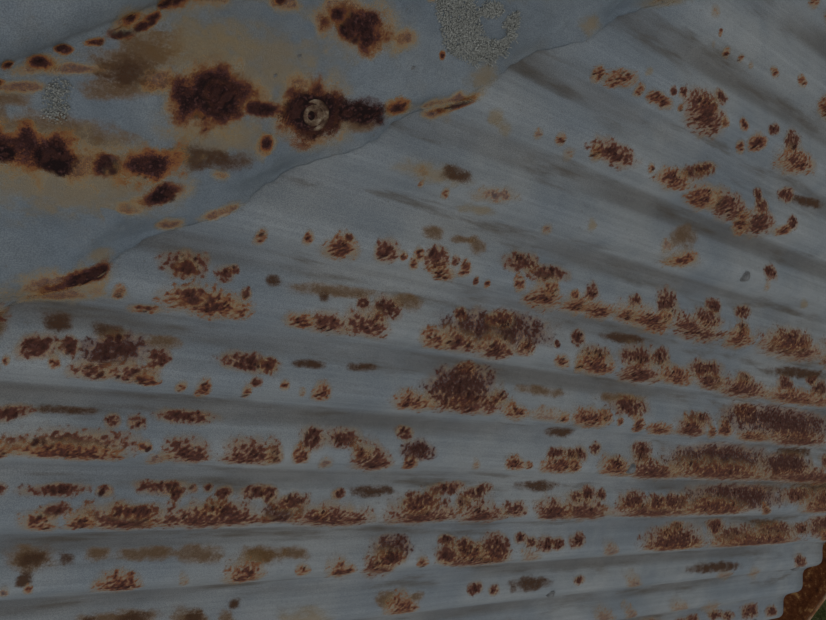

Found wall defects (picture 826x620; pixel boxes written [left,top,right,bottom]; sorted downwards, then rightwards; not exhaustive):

rust [0,0,417,215]
rust [421,91,481,119]
rust [592,66,729,137]
rust [585,138,633,169]
rust [736,118,813,175]
rust [648,162,798,237]
rust [0,251,826,568]
rust [91,569,141,592]
rust [224,556,265,584]
rust [326,533,414,578]